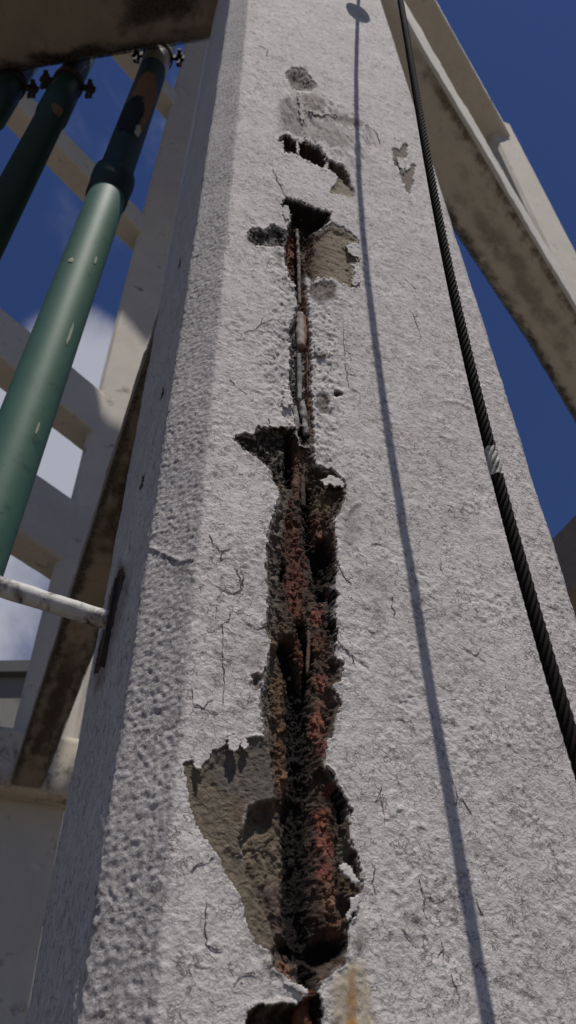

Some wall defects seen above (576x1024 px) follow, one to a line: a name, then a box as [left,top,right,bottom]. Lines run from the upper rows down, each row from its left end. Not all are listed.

peeling [278,68,361,198]
peeling [392,144,416,194]
damp [448,207,576,424]
spalling [183,198,362,1024]
crack [204,898,221,950]